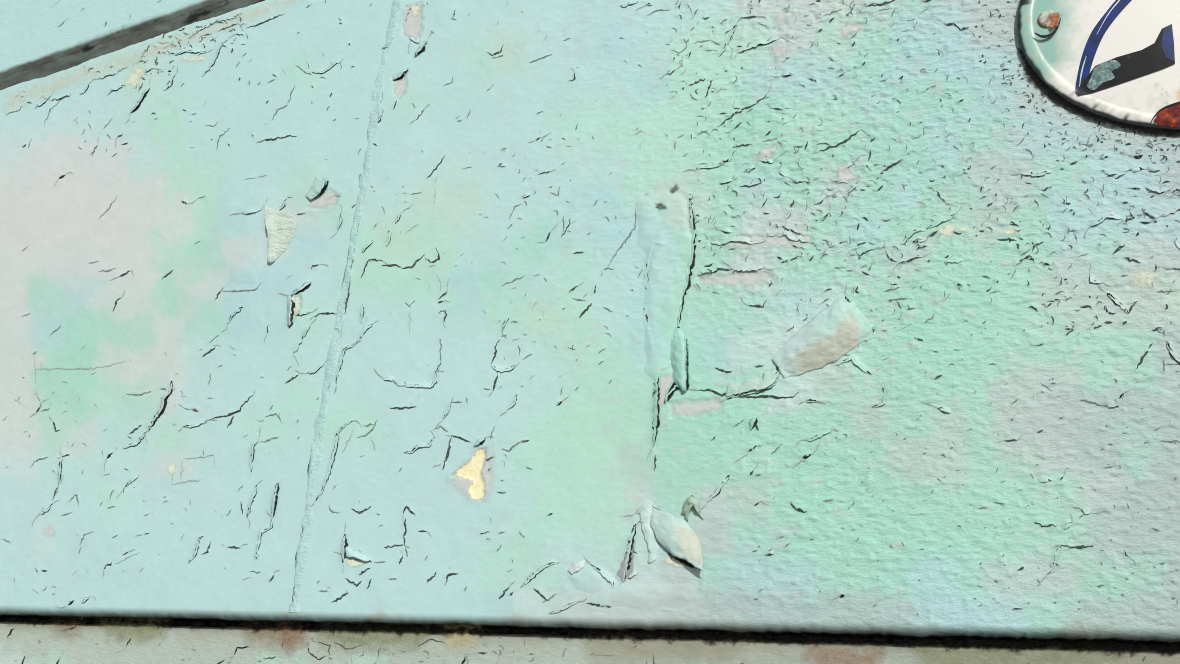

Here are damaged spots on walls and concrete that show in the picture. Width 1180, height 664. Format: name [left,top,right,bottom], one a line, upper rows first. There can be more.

peeling [306,176,337,207]
peeling [264,201,297,263]
crack [4,0,661,664]
crack [606,0,1180,616]
peeling [452,449,493,500]
peeling [637,495,703,571]